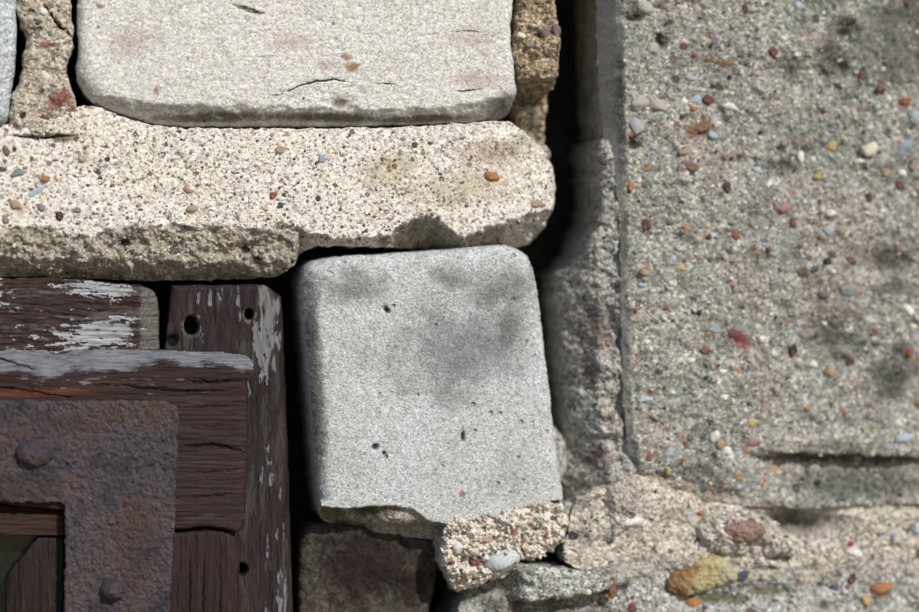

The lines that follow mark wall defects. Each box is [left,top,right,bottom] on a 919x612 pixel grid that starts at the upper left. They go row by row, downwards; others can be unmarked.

crack [271,78,357,95]
peeling [26,279,146,353]
peeling [236,285,281,397]
peeling [260,445,281,499]
peeling [265,570,287,612]